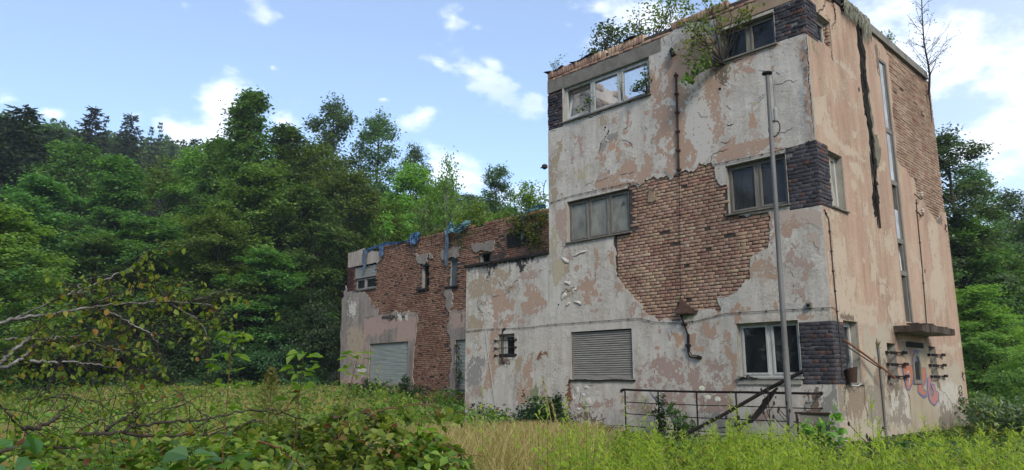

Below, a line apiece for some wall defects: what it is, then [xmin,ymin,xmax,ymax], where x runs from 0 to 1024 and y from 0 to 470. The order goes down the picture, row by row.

crack [732,1,836,150]
flaking render [449,34,823,414]
peeling [344,314,417,386]